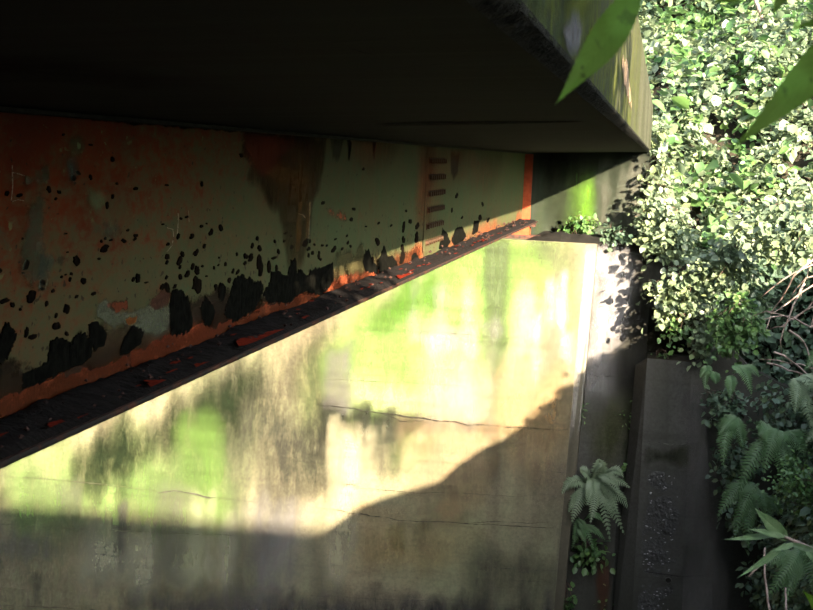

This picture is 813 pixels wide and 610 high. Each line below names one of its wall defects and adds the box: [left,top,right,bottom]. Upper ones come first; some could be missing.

peeling [0,269,383,418]
corrosion [0,132,420,398]
leakage [485,241,508,374]
leakage [250,344,431,582]
leakage [91,505,156,588]
leakage [152,530,502,610]